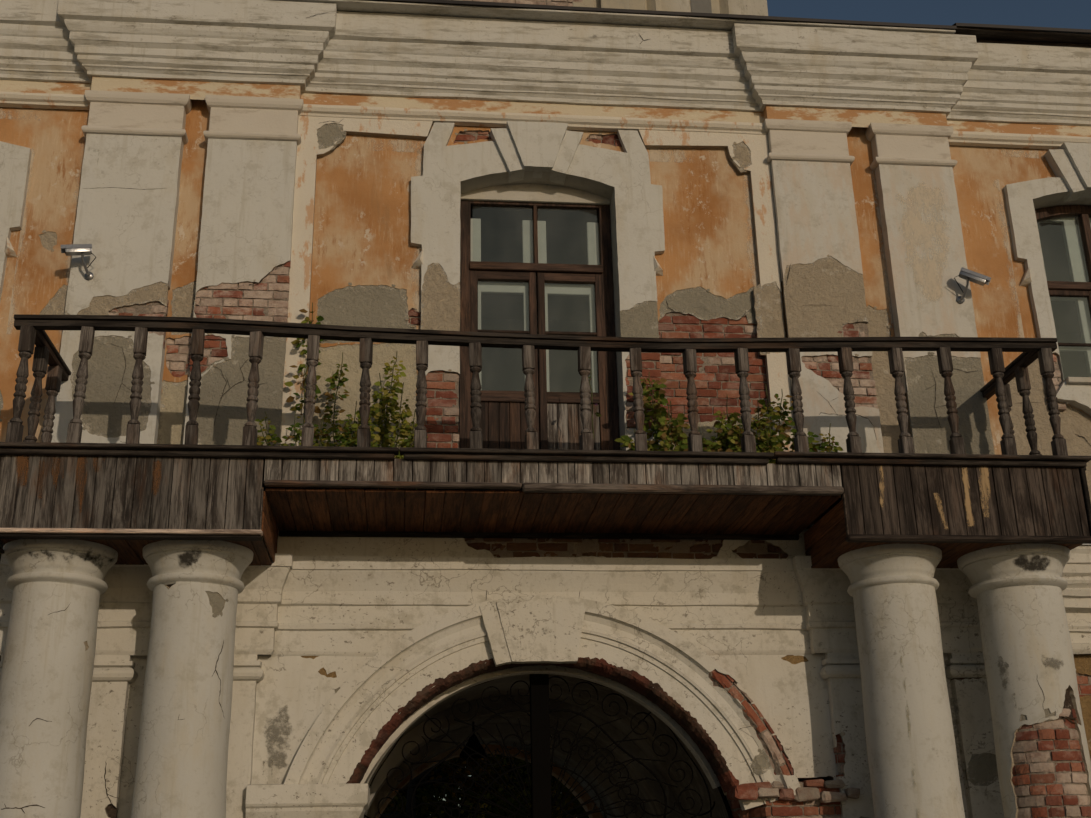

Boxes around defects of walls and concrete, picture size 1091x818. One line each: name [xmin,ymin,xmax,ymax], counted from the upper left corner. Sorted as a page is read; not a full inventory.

flaking render [40,260,291,322]
flaking render [405,263,460,331]
flaking render [658,255,892,338]
flaking render [149,332,235,444]
flaking render [312,342,460,448]
flaking render [625,352,786,451]
flaking render [801,351,901,453]
flaking render [464,530,788,559]
crack [212,641,224,716]
flaking render [346,657,860,818]
flaking render [1010,673,1091,818]